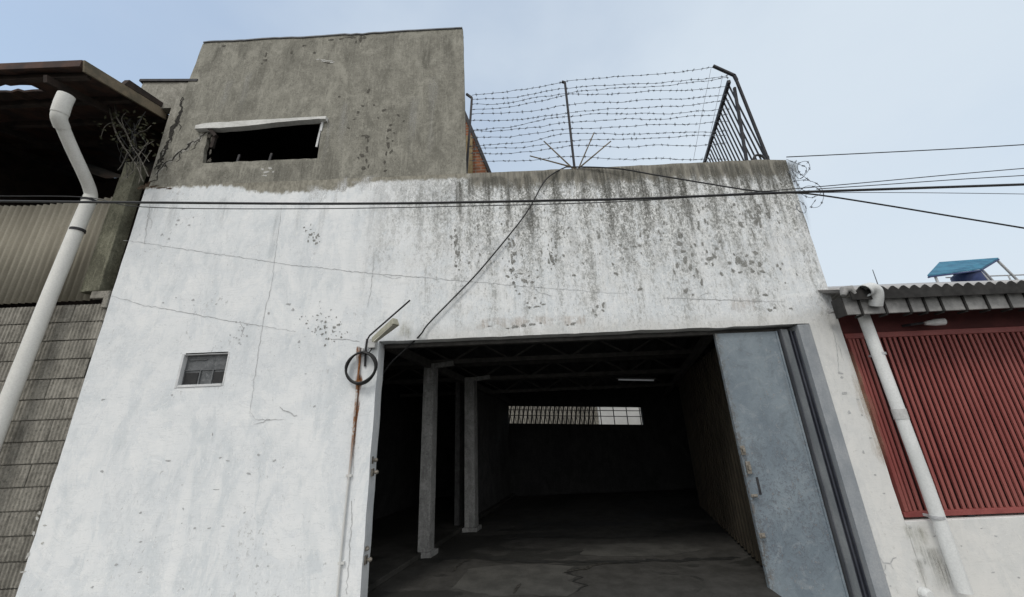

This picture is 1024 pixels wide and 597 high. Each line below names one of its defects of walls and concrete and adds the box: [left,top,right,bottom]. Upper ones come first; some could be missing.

water stain [484,162,798,221]
crack [112,97,593,424]
corrosion [353,375,362,449]